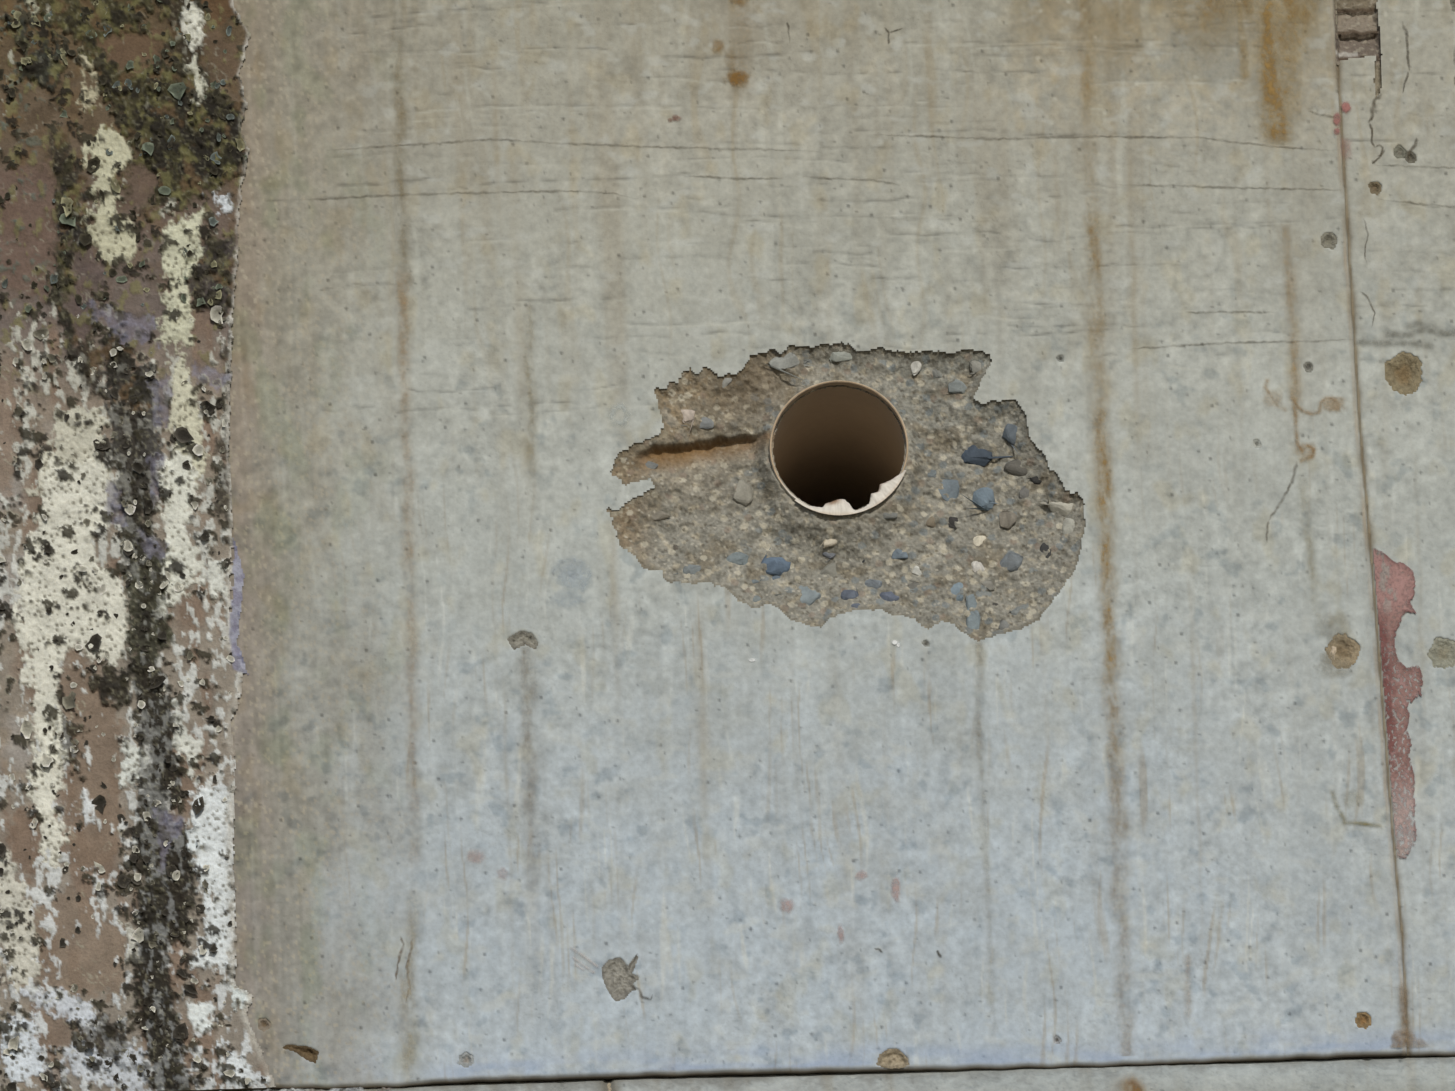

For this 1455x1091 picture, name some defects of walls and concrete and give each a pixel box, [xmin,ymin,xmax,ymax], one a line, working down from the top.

rust [728,70,748,86]
rust [1204,0,1310,140]
spalling [1334,0,1383,97]
spalling [606,341,1086,642]
peeling [1373,549,1423,858]
peeling [602,955,639,1001]